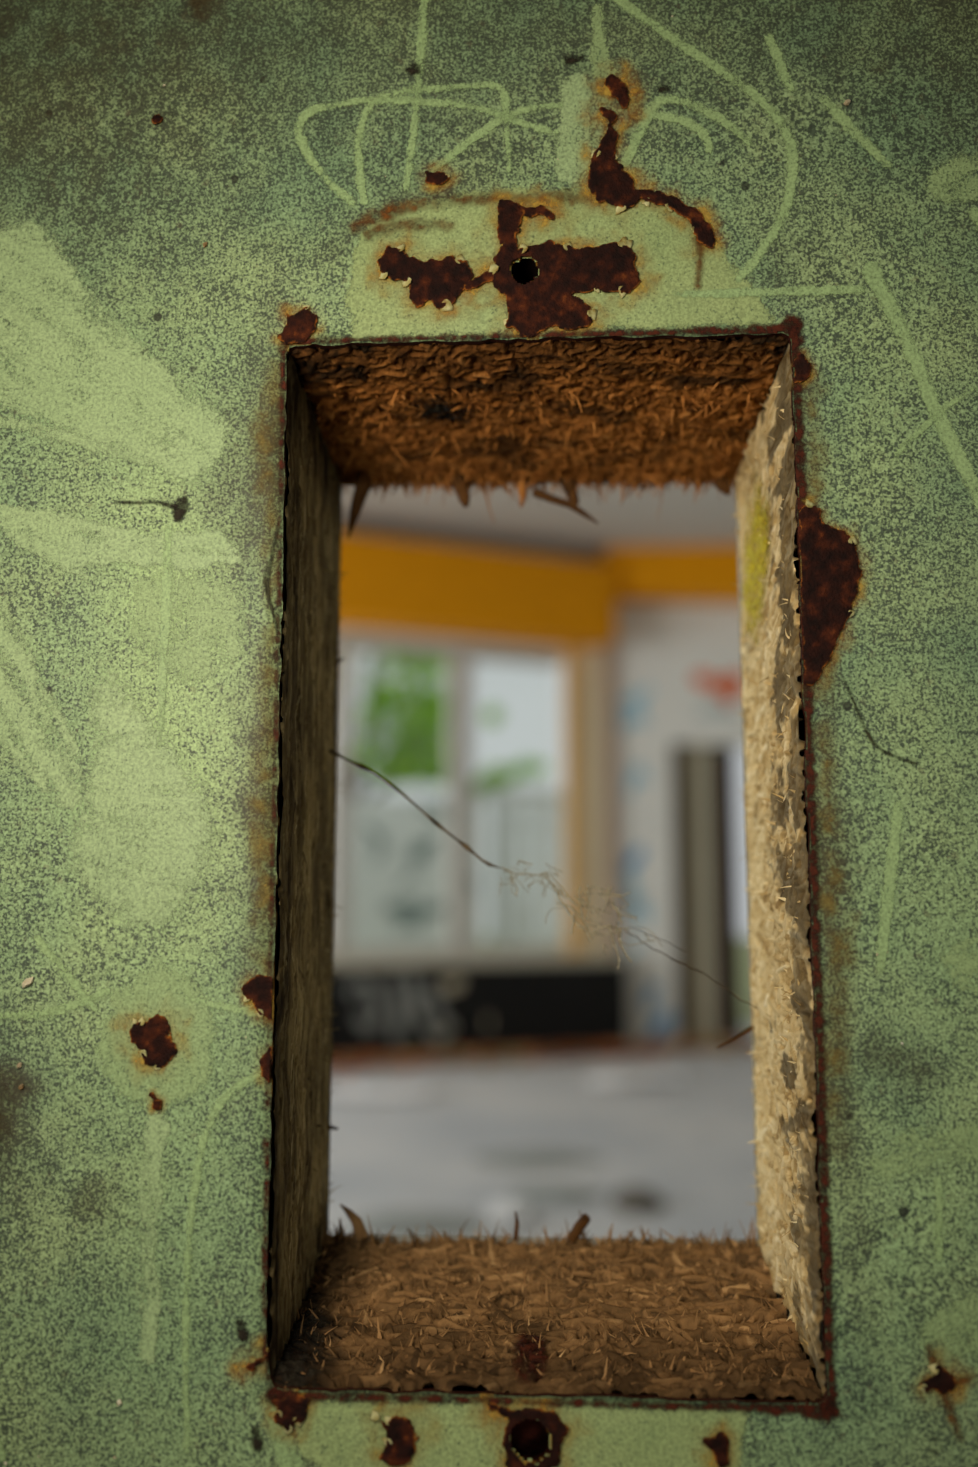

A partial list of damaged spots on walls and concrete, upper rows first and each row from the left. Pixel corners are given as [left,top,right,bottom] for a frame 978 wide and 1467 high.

corrosion [230,64,864,1467]
corrosion [129,1014,177,1070]
corrosion [149,1092,162,1110]
corrosion [917,1350,968,1433]